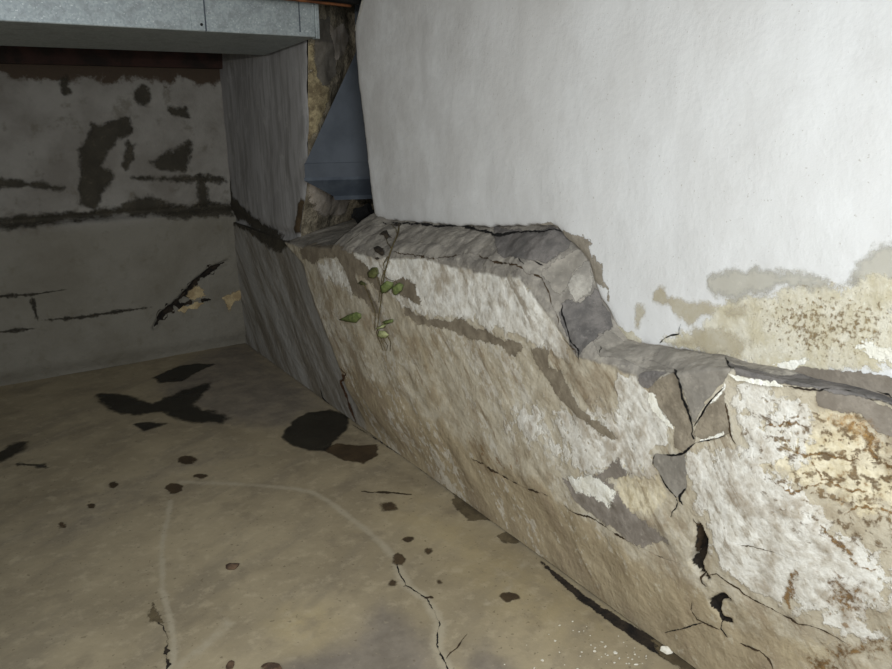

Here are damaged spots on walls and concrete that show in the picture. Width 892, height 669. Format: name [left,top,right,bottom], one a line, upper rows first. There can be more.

water stain [134,84,151,106]
water stain [0,117,287,252]
crack [0,262,241,333]
water stain [97,364,227,431]
water stain [282,410,378,463]
peeling [300,242,618,440]
spalling [494,222,788,497]
water stain [653,247,892,372]
peeling [562,458,669,549]
crack [565,369,845,643]
crack [397,565,467,669]
crack [541,561,703,669]